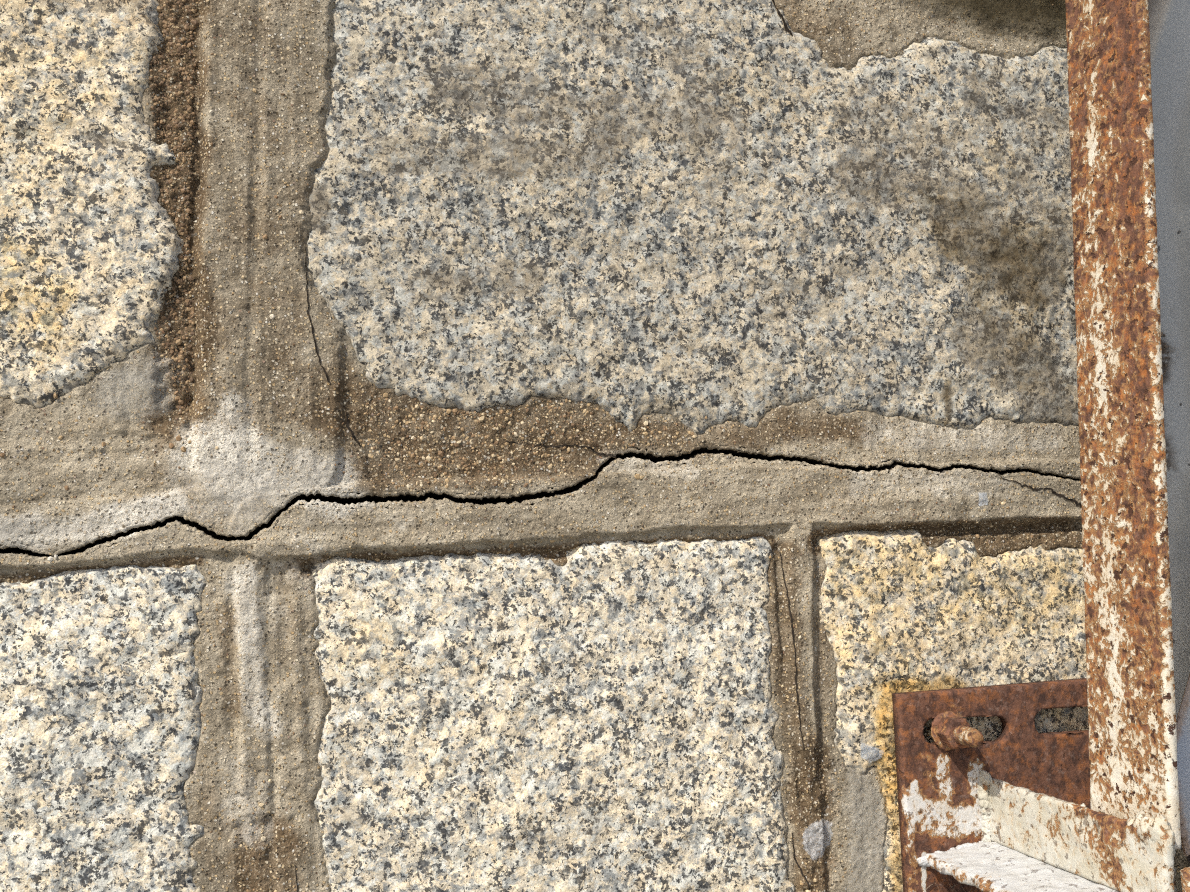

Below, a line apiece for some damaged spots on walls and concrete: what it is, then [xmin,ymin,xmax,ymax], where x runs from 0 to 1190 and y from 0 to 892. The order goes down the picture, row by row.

damp [955,0,1066,29]
crack [0,439,1082,562]